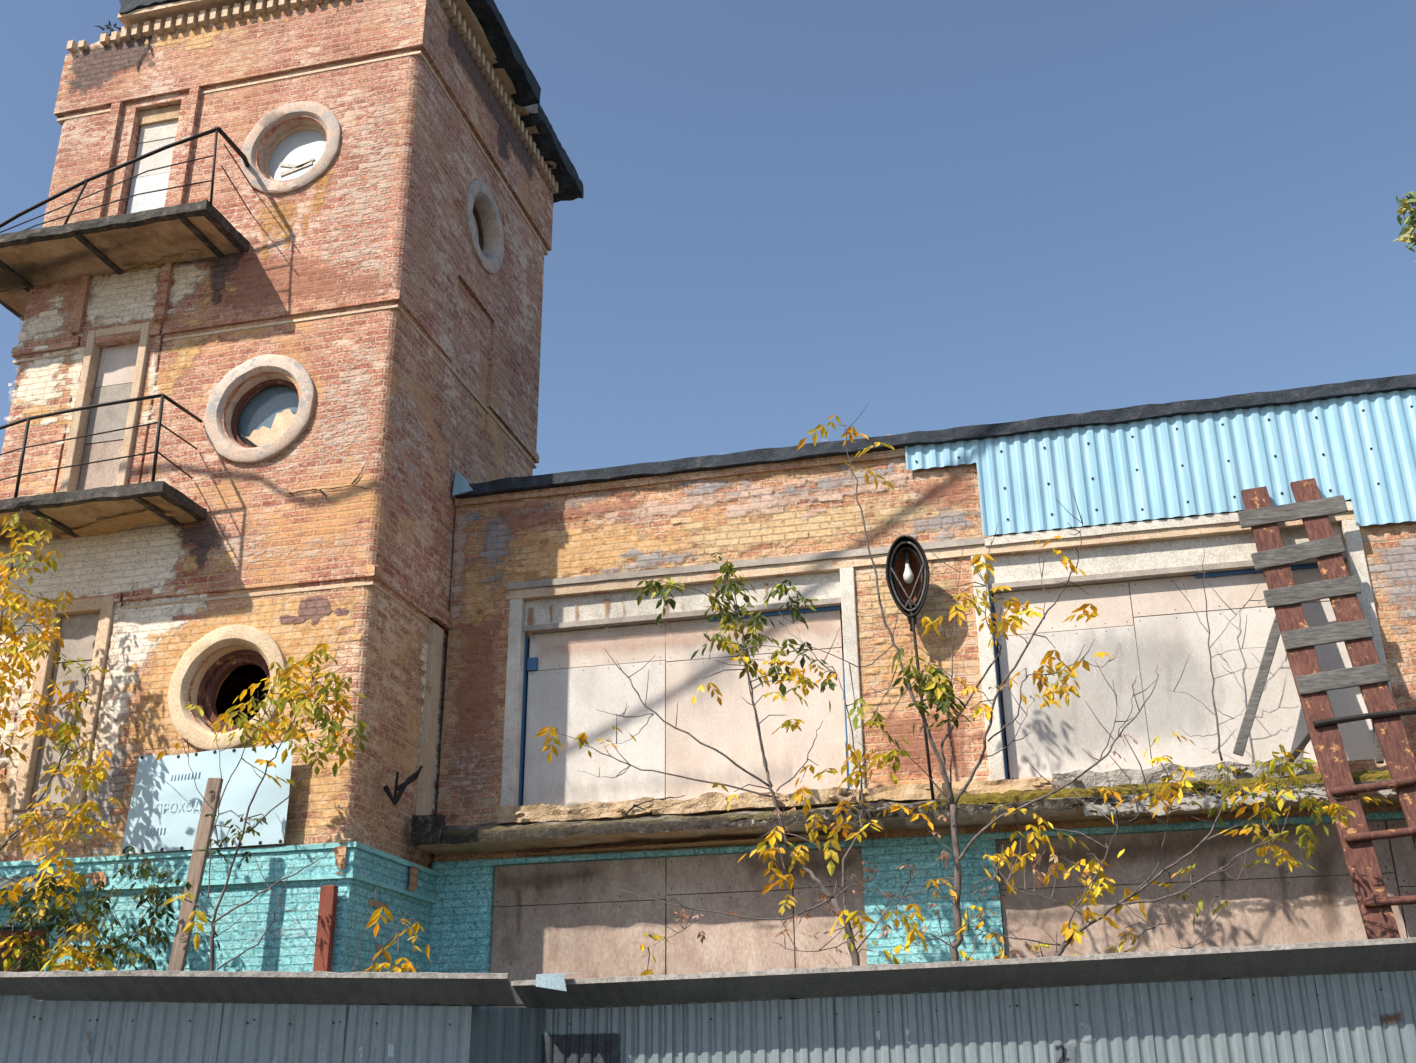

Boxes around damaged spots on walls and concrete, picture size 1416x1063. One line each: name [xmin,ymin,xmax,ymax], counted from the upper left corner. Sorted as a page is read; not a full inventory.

peeling [6,239,391,445]
peeling [0,510,363,874]
damp [175,521,350,577]
peeling [417,463,981,821]
spalling [497,563,1312,824]
peeling [83,872,106,890]